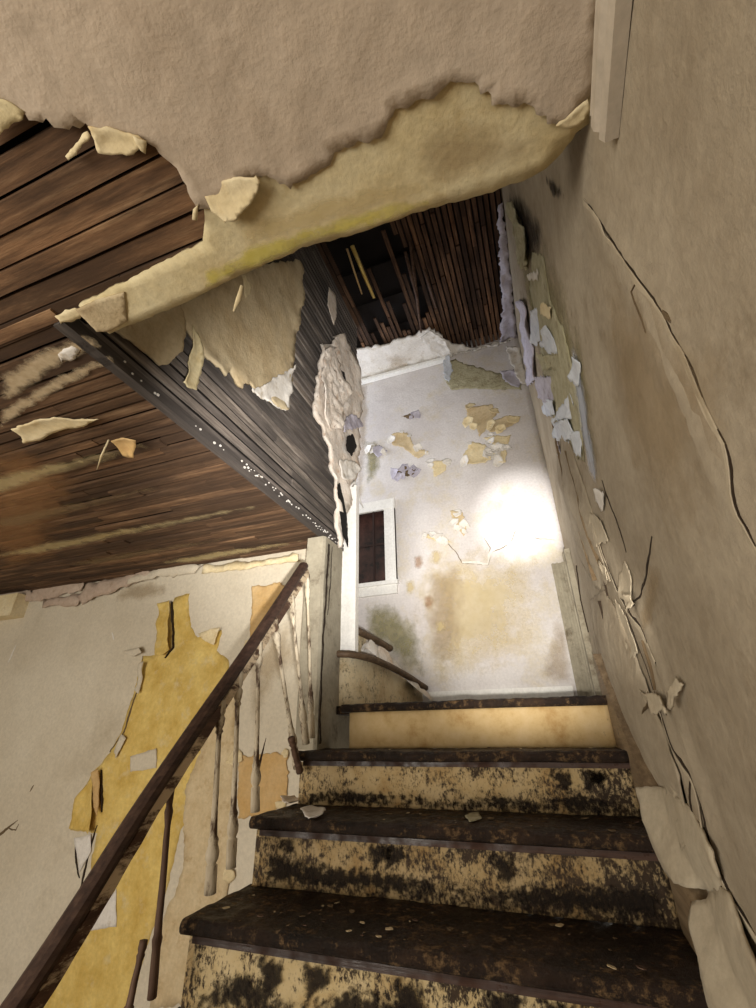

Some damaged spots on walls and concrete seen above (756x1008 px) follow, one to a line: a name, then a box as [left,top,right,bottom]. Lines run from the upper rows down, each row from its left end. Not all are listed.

peeling [65,126,147,160]
peeling [55,259,305,411]
spalling [312,201,585,548]
crack [583,199,756,558]
peeling [69,594,229,885]
peeling [44,697,326,1008]
water stain [198,956,423,1008]
water stain [266,838,664,922]
water stain [306,770,628,815]
water stain [483,990,525,1008]
crack [576,481,756,943]
peeling [635,783,756,1008]